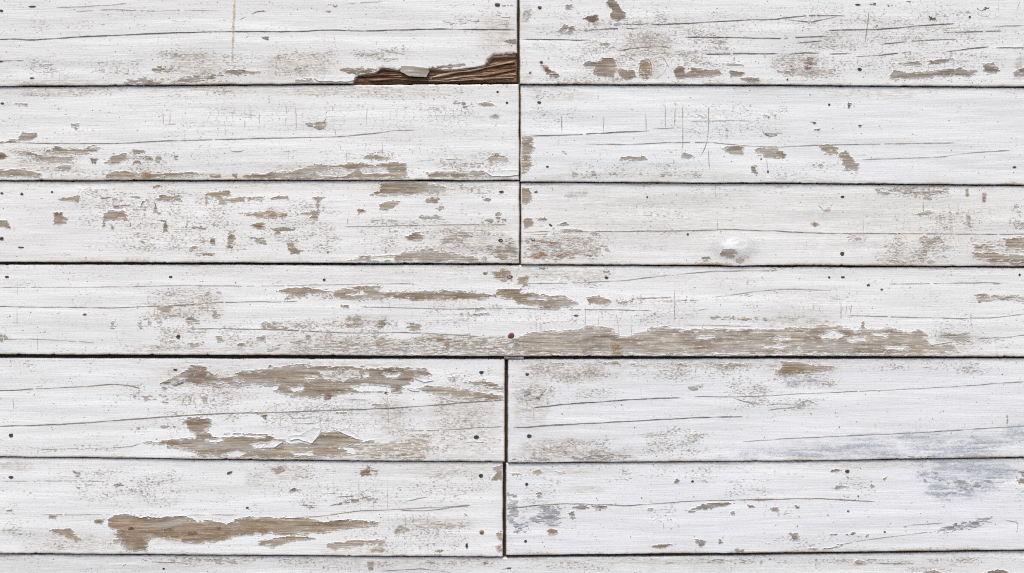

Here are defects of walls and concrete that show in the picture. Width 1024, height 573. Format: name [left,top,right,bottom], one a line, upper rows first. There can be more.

peeling [557,0,626,34]
peeling [400,63,466,77]
peeling [583,42,637,80]
peeling [672,60,761,83]
peeling [770,54,817,73]
peeling [888,57,1024,81]
peeling [0,132,972,476]
crack [0,381,1023,449]
peeling [93,487,468,564]